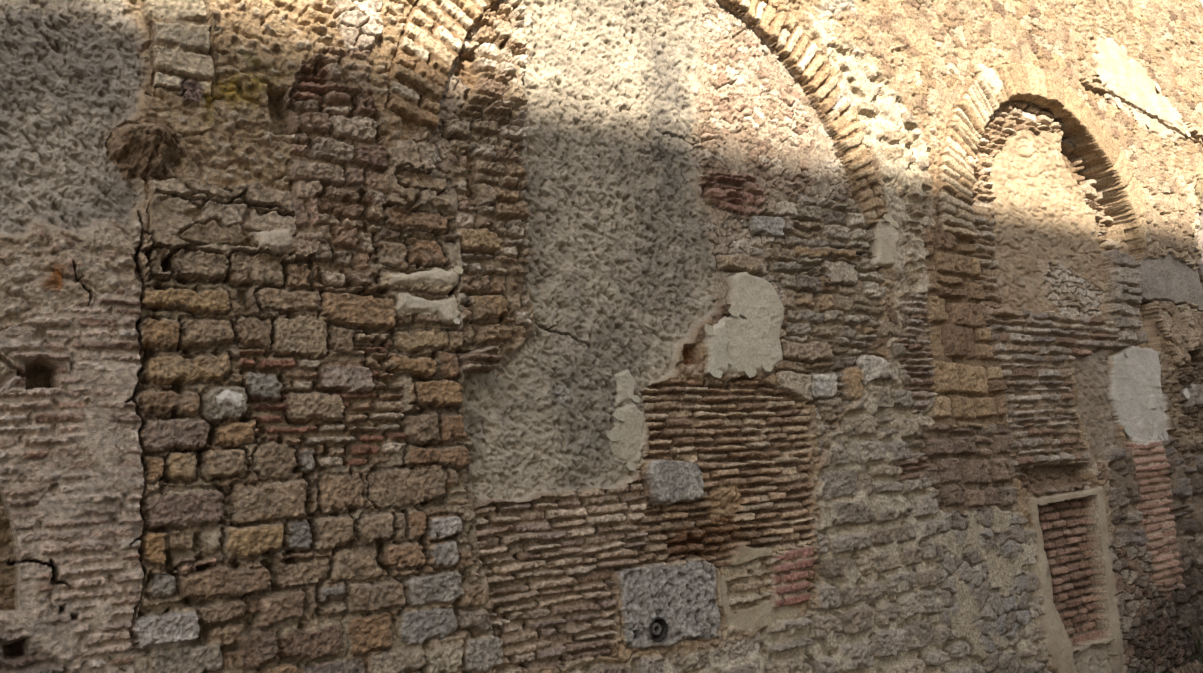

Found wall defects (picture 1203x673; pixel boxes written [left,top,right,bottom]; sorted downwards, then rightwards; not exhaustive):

flaking render [703,272,785,378]